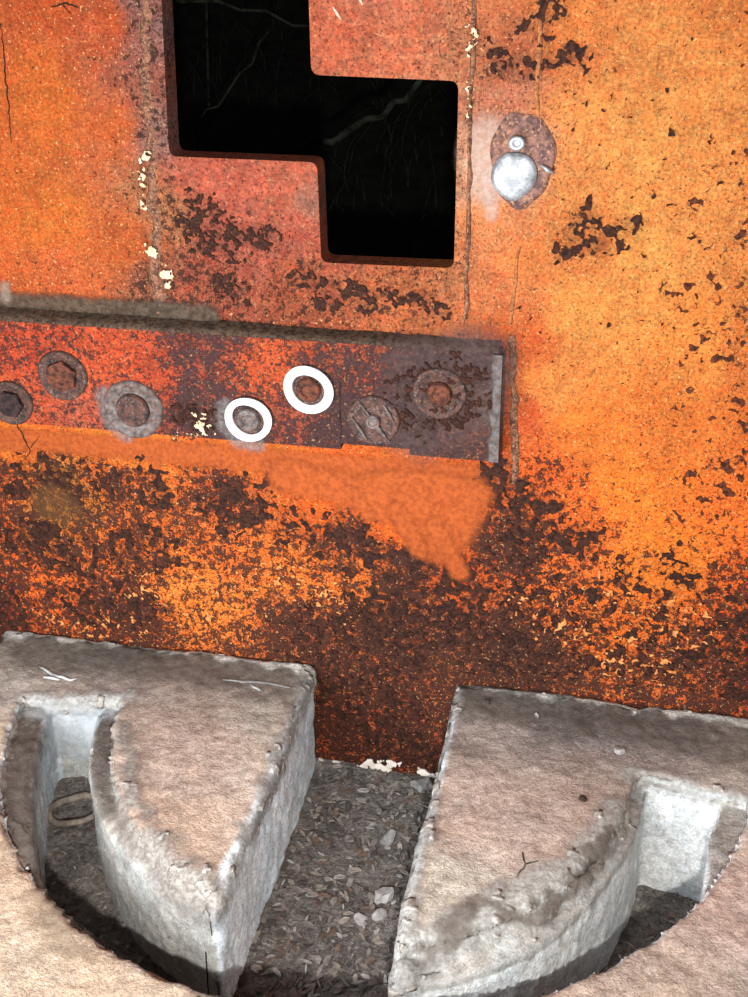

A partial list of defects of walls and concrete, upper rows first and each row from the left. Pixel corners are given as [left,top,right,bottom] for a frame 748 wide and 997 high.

corrosion [0,429,492,579]